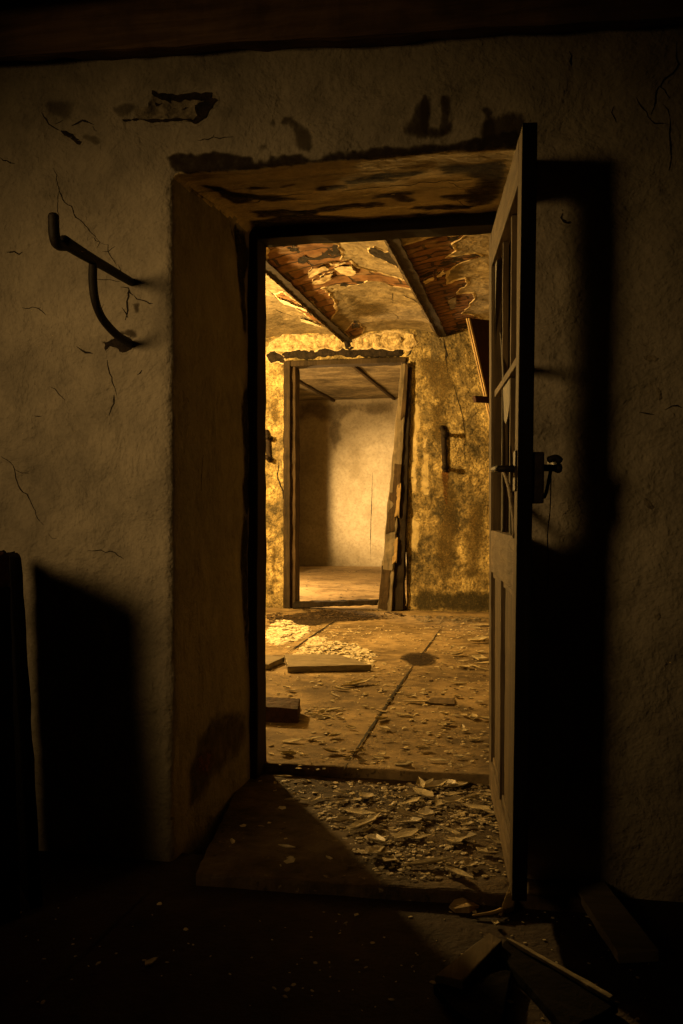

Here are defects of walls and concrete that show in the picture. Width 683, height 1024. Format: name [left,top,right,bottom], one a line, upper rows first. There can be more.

flaking render [121,90,220,126]
crack [53,169,153,320]
leakage [168,95,523,332]
flaking render [266,235,484,364]
crack [2,457,57,539]
leakage [401,652,437,665]